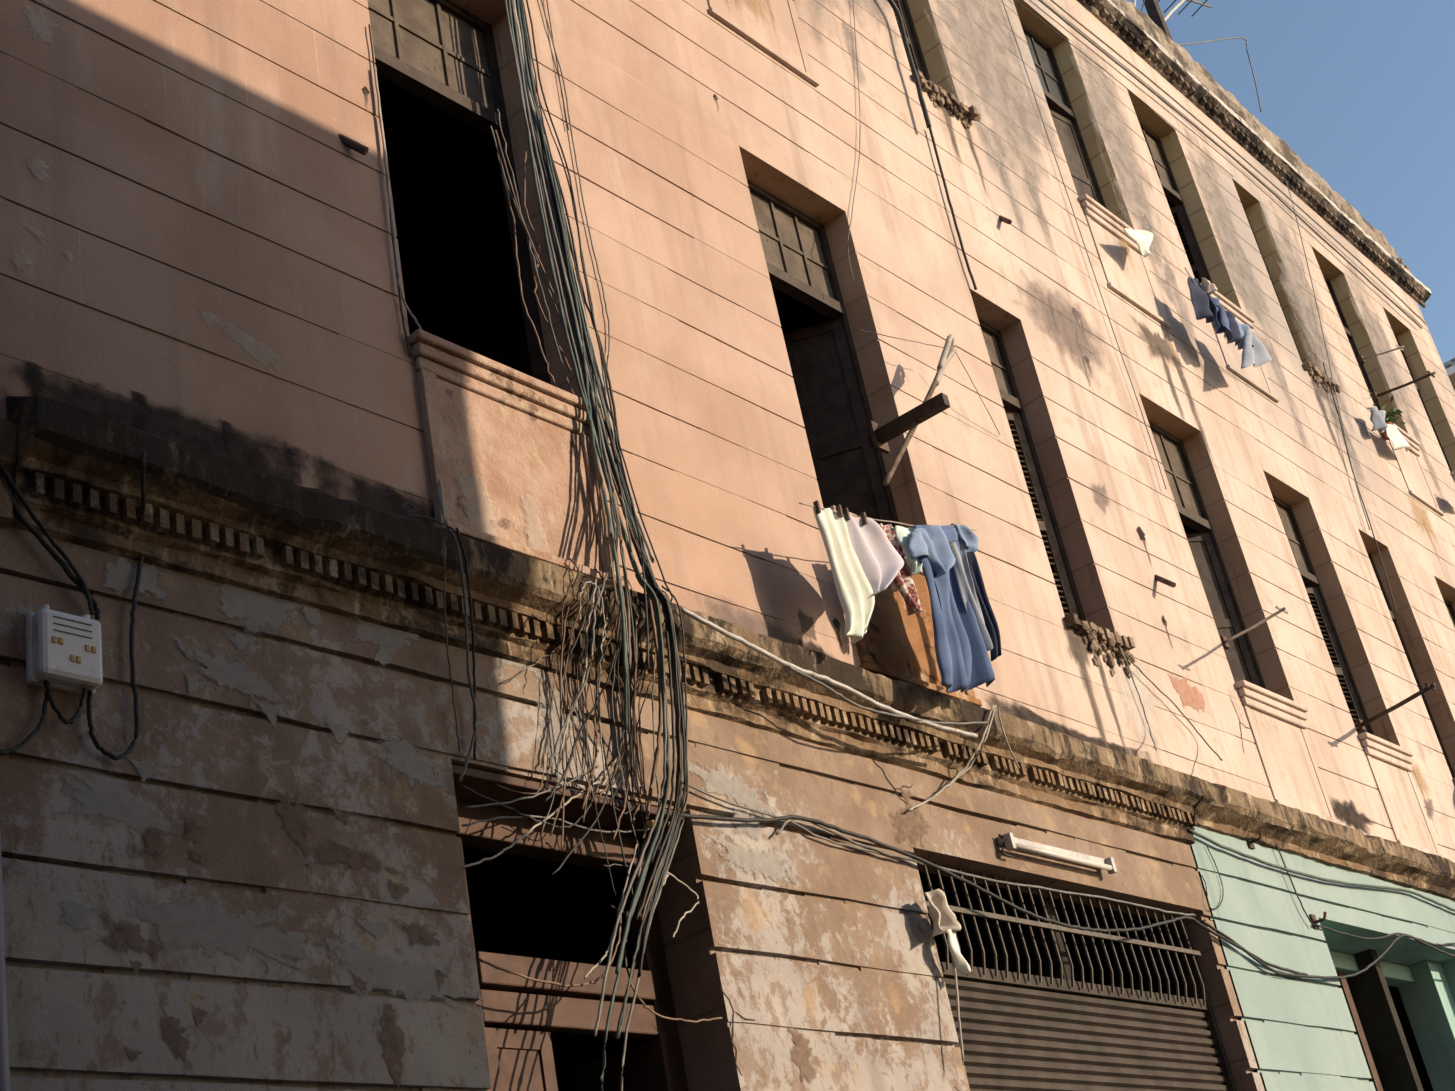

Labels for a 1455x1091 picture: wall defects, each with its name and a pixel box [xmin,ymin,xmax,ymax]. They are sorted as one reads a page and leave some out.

leakage [848,0,887,15]
leakage [845,25,861,78]
leakage [941,0,1049,224]
leakage [20,362,299,482]
leakage [319,460,435,526]
peeling [104,557,167,600]
peeling [174,583,322,728]
peeling [347,619,420,665]
spalling [891,789,931,848]
leakage [1332,801,1371,833]
peeling [161,1004,208,1062]
peeling [790,1027,817,1083]